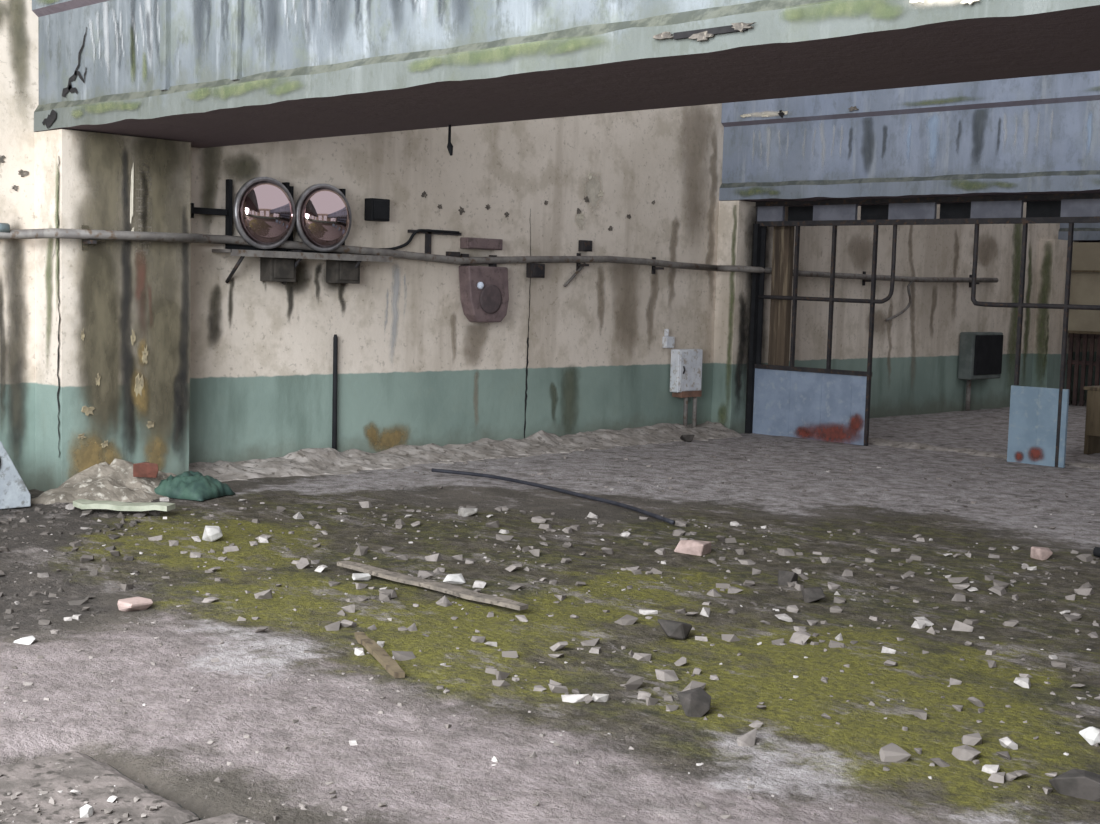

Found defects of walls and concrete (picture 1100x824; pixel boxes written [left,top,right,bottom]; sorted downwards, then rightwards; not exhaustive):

crack [42,27,87,128]
water stain [99,0,160,78]
water stain [194,0,228,47]
water stain [260,0,286,41]
water stain [332,0,370,35]
water stain [688,112,716,264]
water stain [77,131,257,448]
water stain [735,296,745,402]
water stain [1024,250,1032,366]